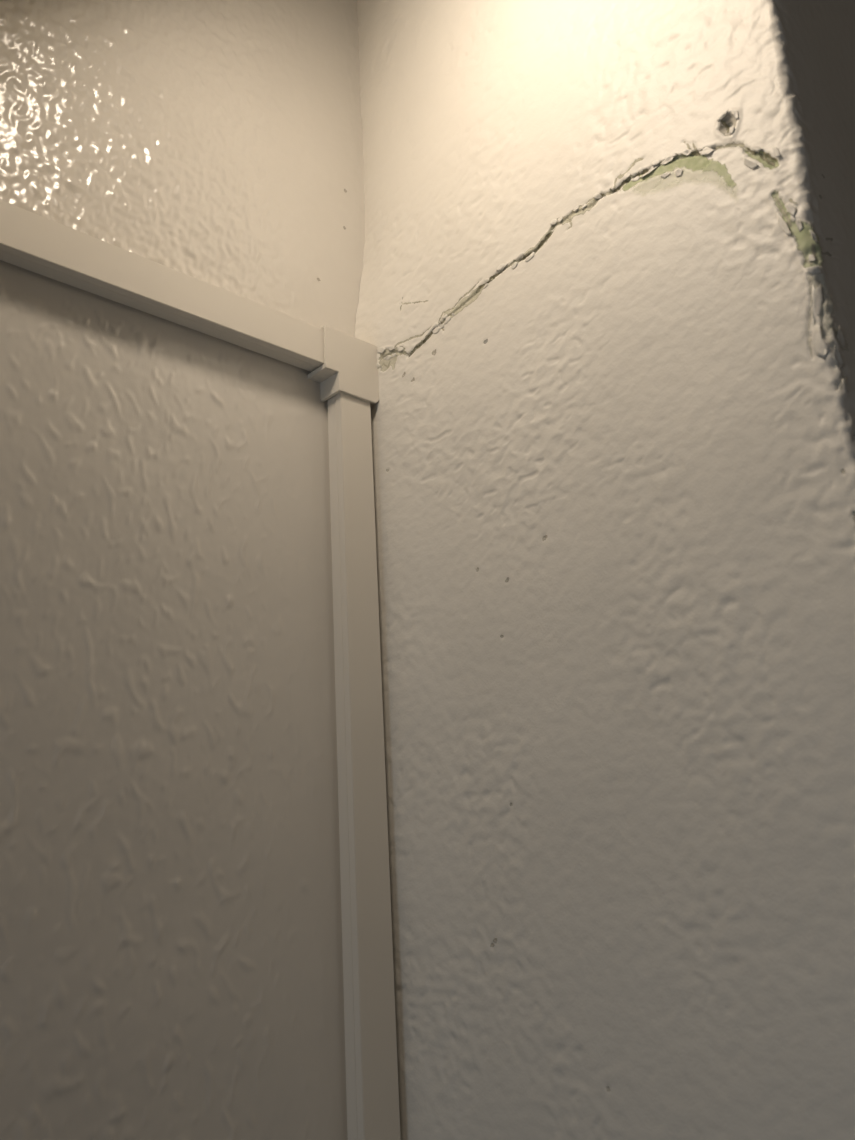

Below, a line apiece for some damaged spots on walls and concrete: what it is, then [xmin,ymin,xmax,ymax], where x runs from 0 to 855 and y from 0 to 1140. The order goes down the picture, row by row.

crack [379,120,775,363]
spalling [772,191,849,393]